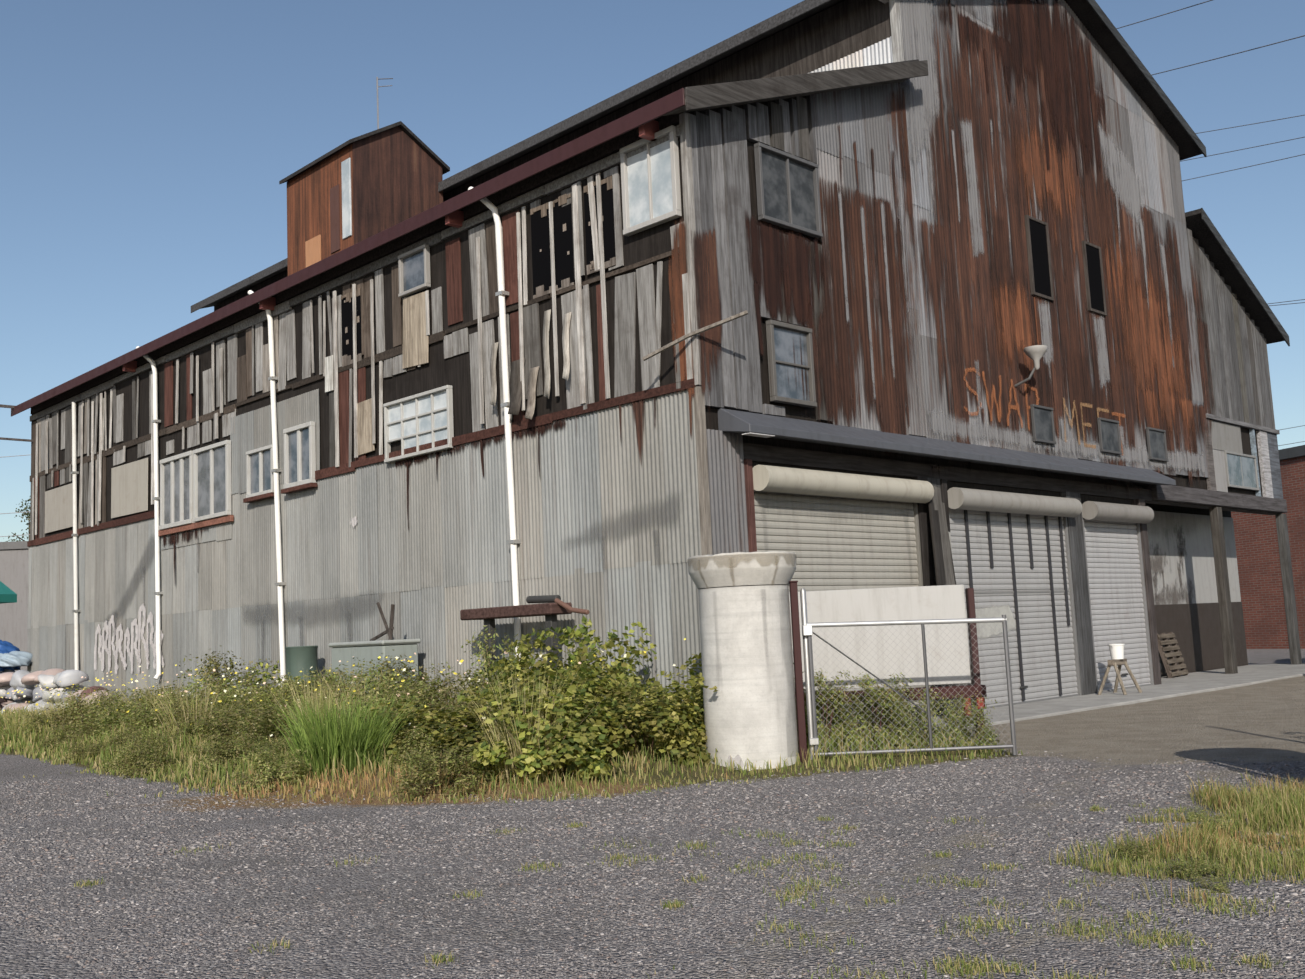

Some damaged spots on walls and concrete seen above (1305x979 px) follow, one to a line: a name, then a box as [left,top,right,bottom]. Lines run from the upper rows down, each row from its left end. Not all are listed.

corrosion [745,0,1214,488]